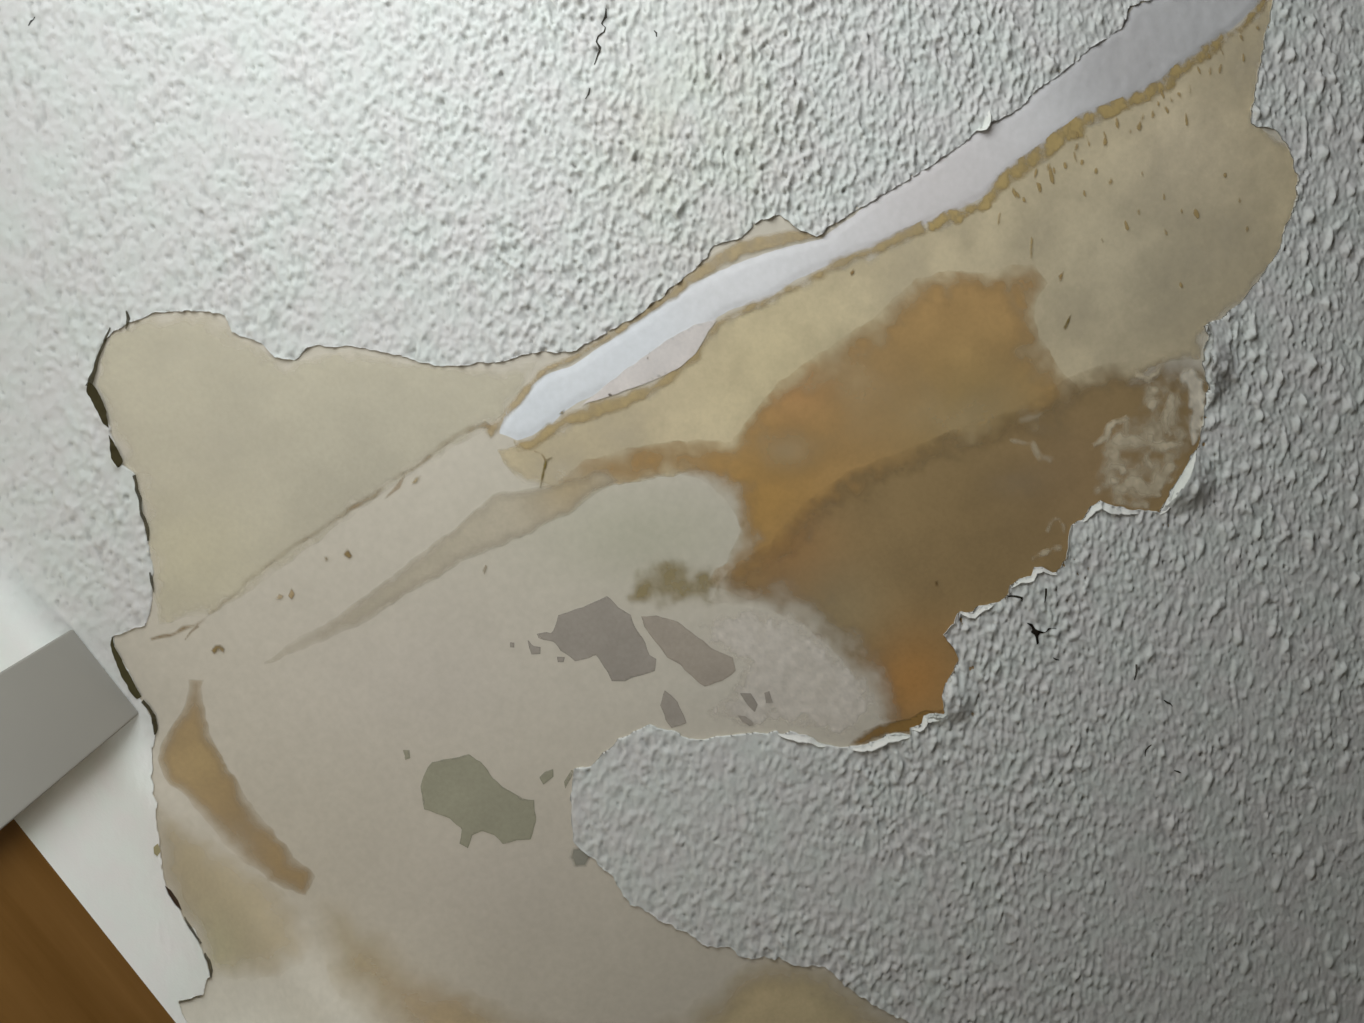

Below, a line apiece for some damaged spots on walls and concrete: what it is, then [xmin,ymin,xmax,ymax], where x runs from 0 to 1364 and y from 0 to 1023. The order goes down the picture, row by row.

peeling [1126,0,1270,130]
peeling [1026,112,1119,192]
leakage [102,231,821,619]
leakage [341,0,1297,744]
peeling [1129,239,1282,386]
peeling [93,175,1026,1023]
peeling [1011,568,1057,588]
peeling [1066,502,1138,559]
leakage [163,698,308,890]
leakage [572,849,589,865]